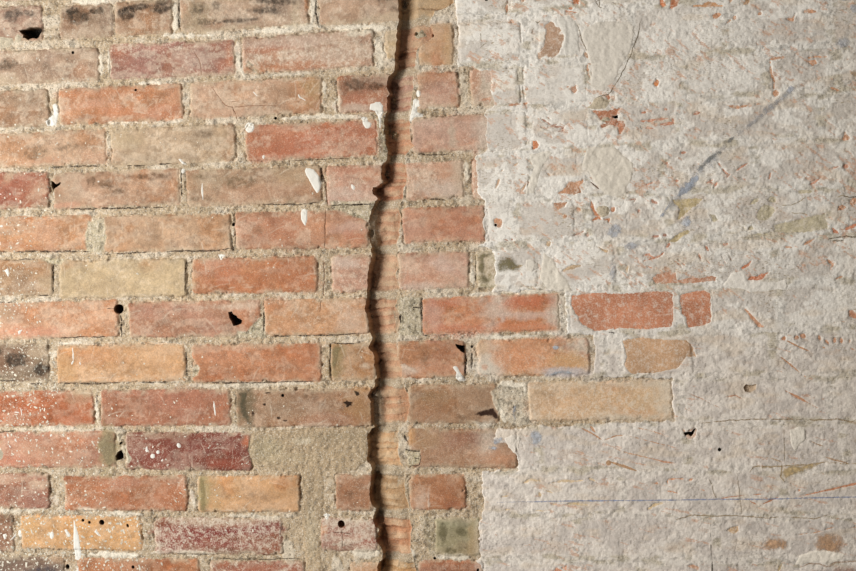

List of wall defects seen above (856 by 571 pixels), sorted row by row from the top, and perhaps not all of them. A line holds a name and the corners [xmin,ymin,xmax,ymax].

crack [195,54,272,121]
crack [213,378,309,386]
crack [263,0,454,571]
peeling [455,0,856,571]